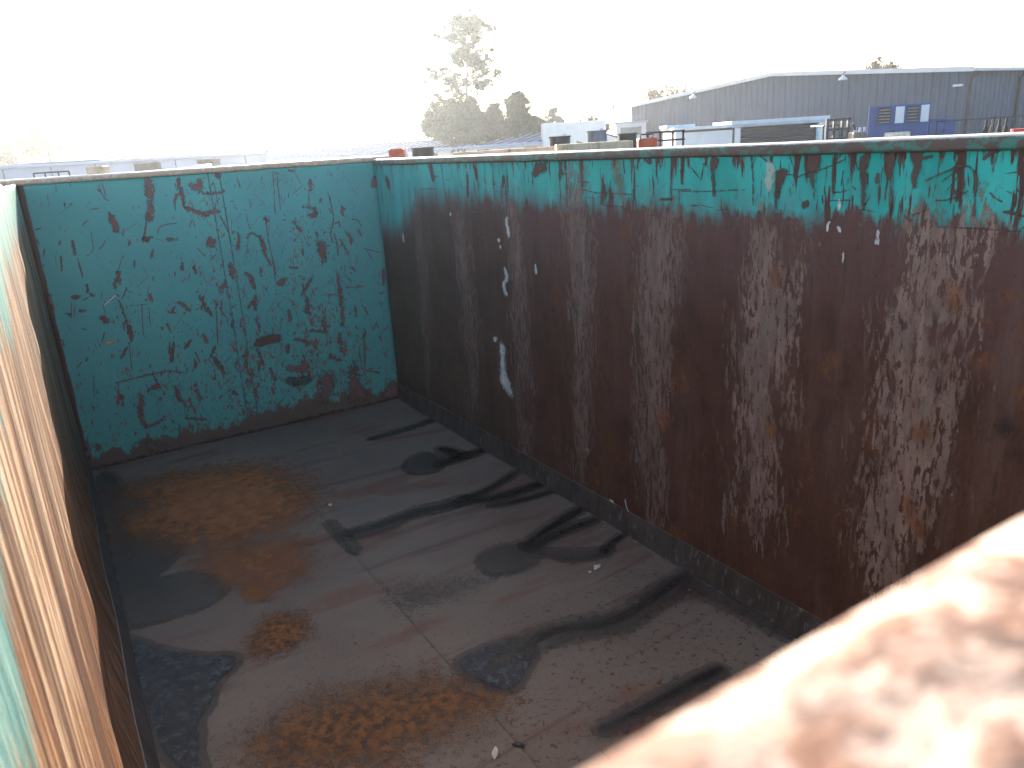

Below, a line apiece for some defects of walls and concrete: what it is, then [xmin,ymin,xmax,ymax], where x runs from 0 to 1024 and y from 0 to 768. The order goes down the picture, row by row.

peeling [763,159,776,193]
rust [950,164,978,217]
spalling [254,333,282,347]
leakage [406,447,485,474]
leakage [480,506,623,575]
leakage [498,570,796,665]